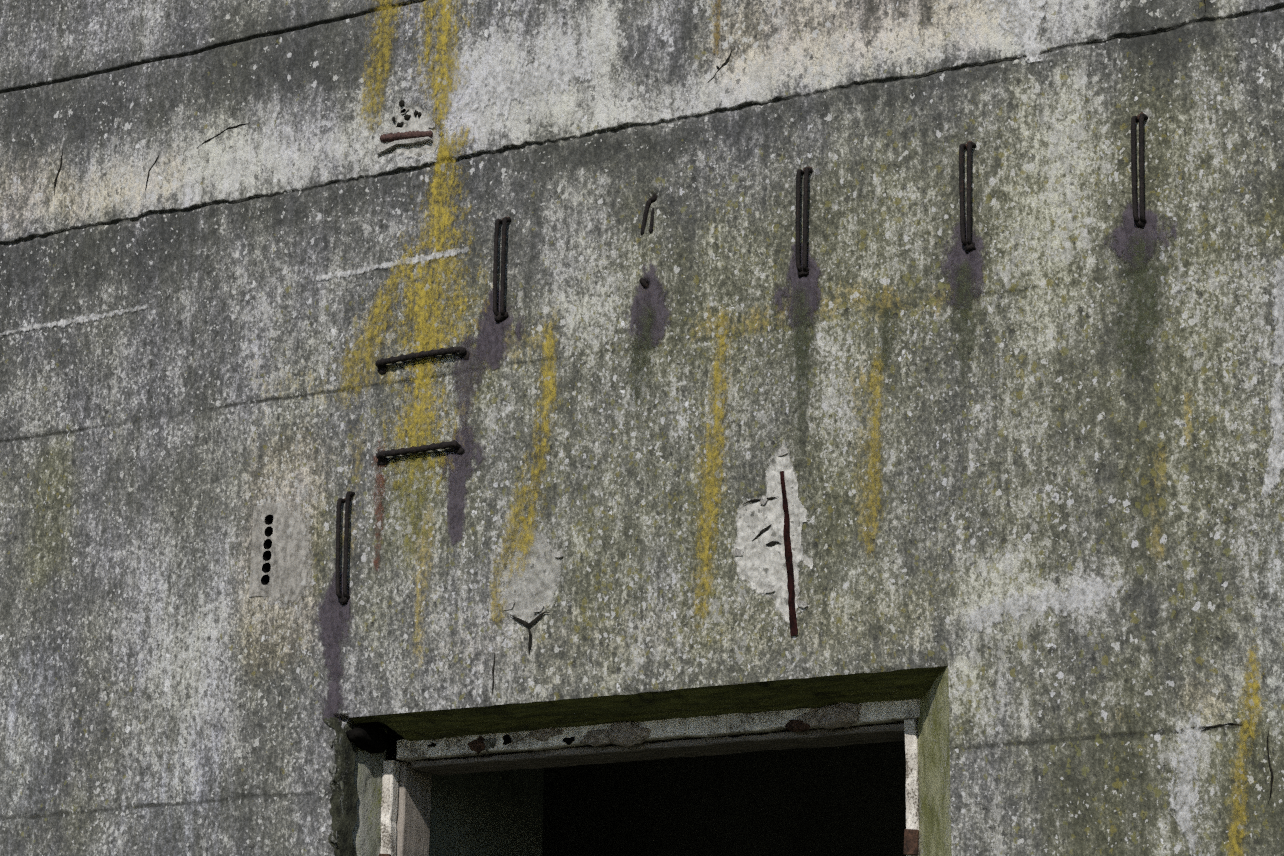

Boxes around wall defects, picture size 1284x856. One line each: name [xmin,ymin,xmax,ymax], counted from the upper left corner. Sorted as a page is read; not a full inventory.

crack [1086,0,1206,44]
crack [0,0,427,94]
crack [707,50,792,112]
crack [902,50,1053,79]
crack [197,122,250,148]
crack [54,151,63,195]
crack [409,145,526,171]
crack [186,194,276,211]
crack [40,223,111,237]
spalling [732,440,818,636]